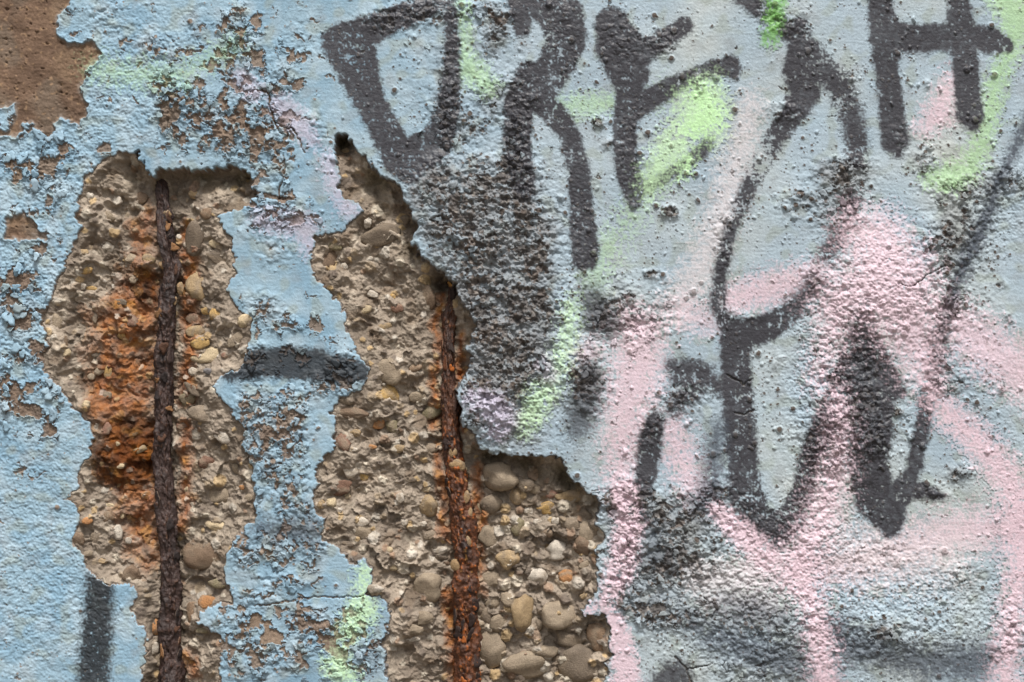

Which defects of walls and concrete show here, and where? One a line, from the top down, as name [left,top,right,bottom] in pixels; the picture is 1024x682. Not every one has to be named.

corrosion [70,189,164,582]
corrosion [171,204,208,546]
corrosion [182,642,204,682]
spalling [0,1,807,682]
corrosion [424,290,470,547]
corrosion [438,584,456,682]
corrosion [468,458,490,600]